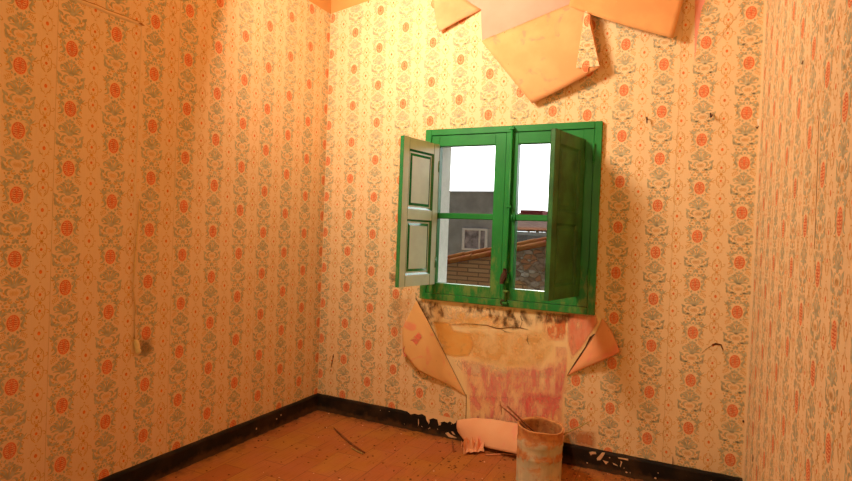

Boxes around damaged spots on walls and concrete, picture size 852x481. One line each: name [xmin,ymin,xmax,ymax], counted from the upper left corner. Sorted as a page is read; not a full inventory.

peeling [433,0,683,103]
peeling [695,0,747,61]
leakage [419,301,565,421]
peeling [402,298,620,454]
leakage [537,312,597,354]